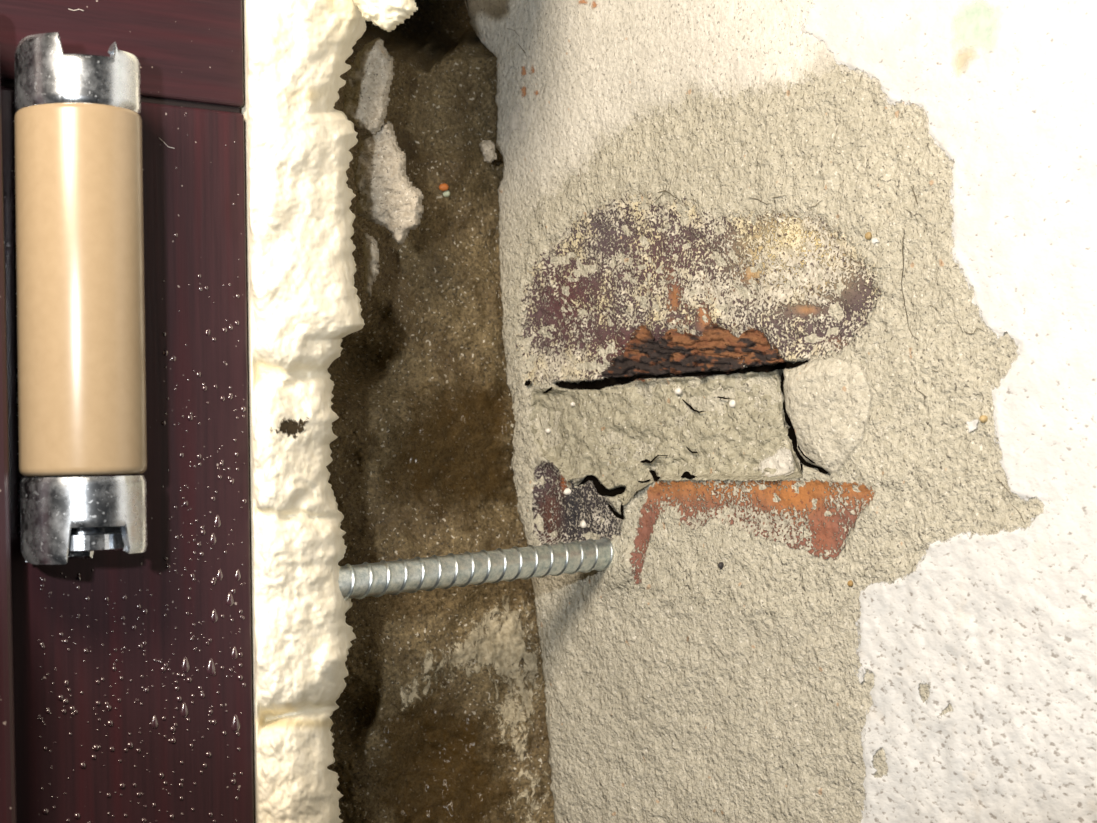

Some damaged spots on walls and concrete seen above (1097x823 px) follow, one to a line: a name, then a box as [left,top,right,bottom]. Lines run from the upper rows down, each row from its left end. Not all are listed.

leakage [383,388,514,506]
crack [577,446,698,519]
crack [524,360,830,475]
peeling [504,0,1097,823]
leakage [370,700,549,823]